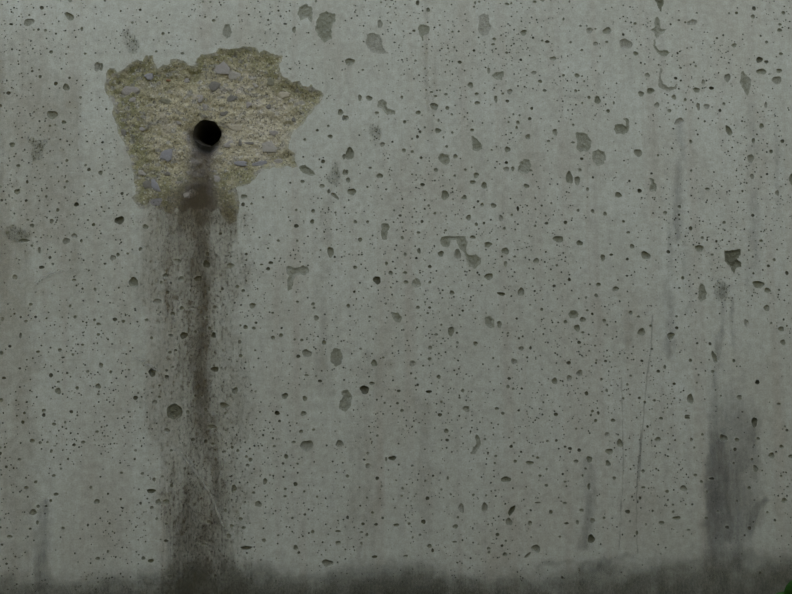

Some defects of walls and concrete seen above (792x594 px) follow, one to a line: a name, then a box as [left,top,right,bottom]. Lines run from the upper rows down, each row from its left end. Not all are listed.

spalling [94,24,324,225]
water stain [71,160,792,594]